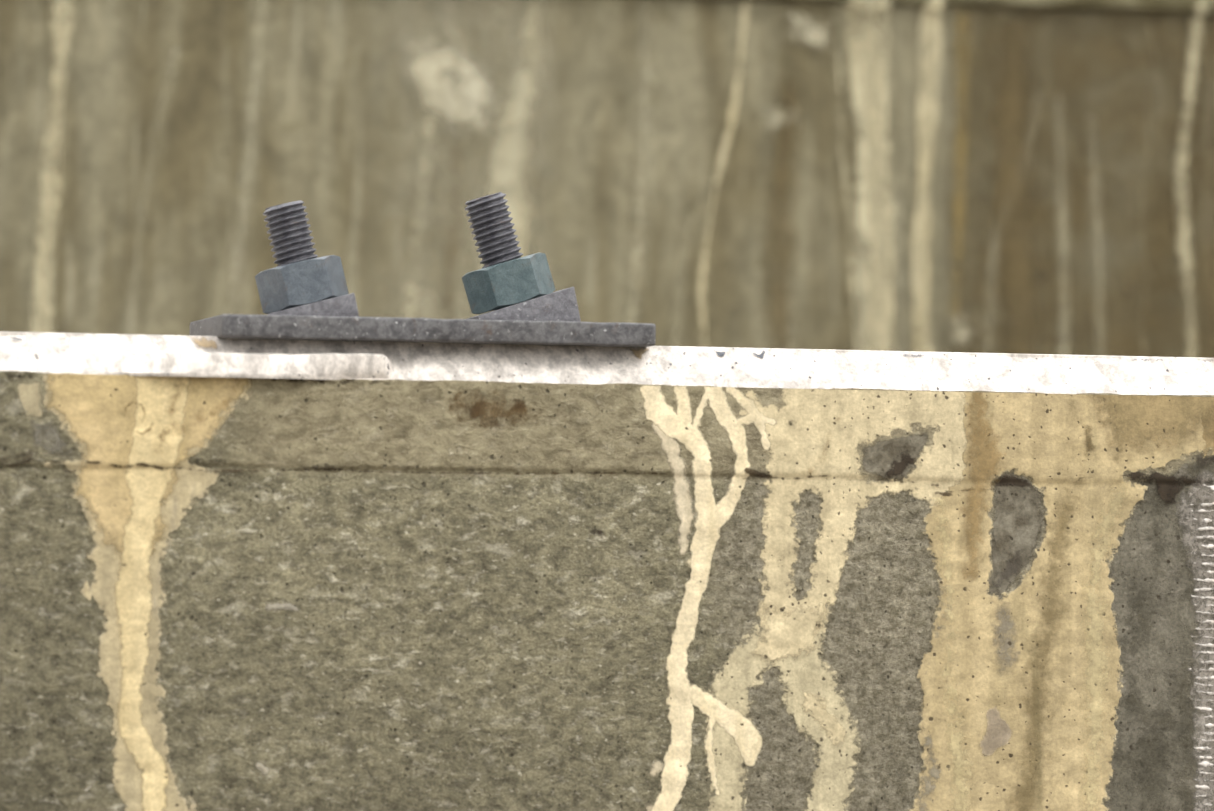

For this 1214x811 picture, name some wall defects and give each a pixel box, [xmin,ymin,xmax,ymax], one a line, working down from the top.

leakage [18,373,253,811]
leakage [640,385,1214,811]